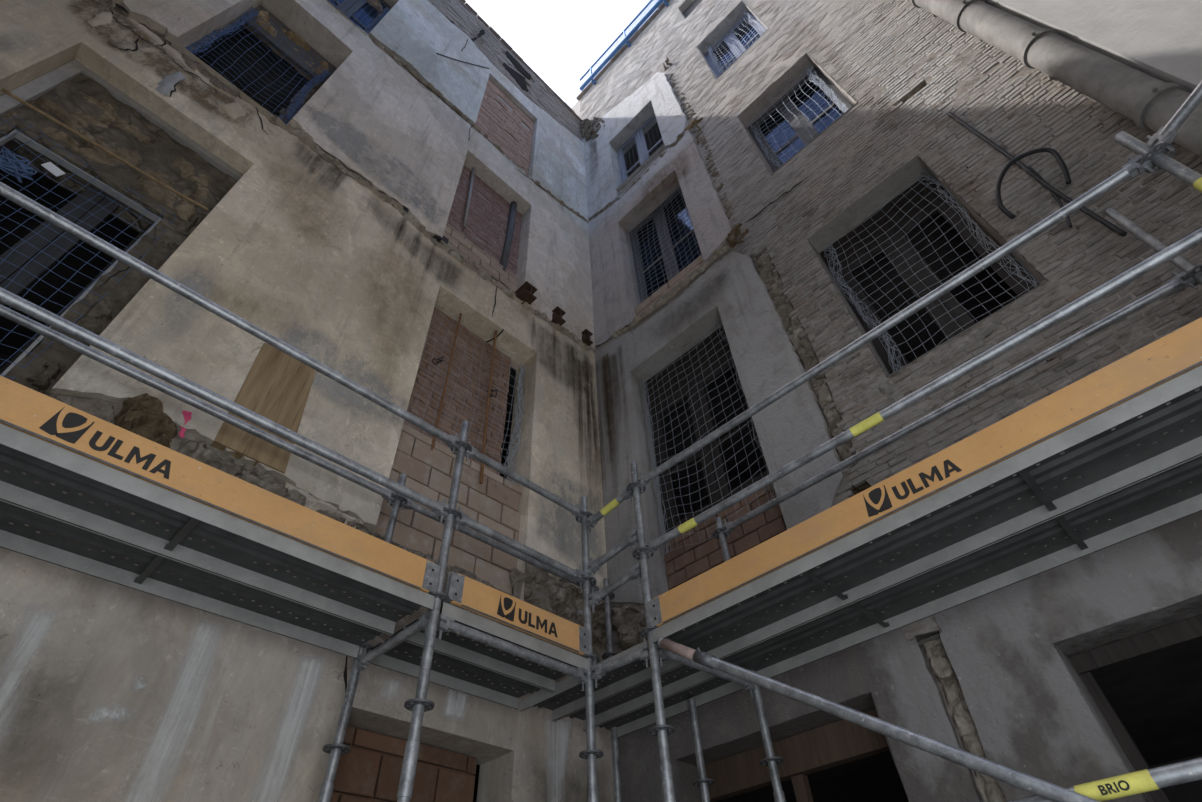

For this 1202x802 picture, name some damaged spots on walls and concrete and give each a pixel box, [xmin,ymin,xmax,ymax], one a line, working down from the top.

crack [316,143,408,210]
crack [401,63,472,139]
flaking render [374,41,741,238]
spalling [753,251,856,466]
water stain [0,615,51,725]
water stain [126,622,219,802]
water stain [257,658,321,802]
spalling [922,638,987,759]
spalling [975,771,1007,802]